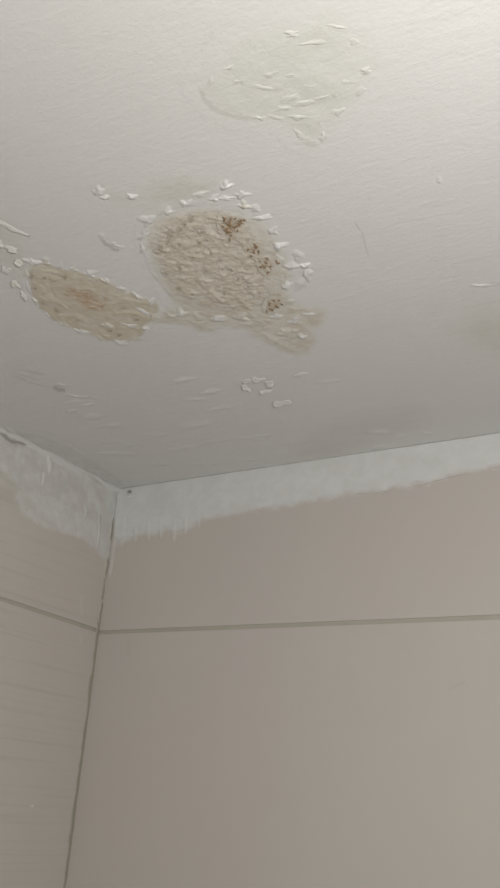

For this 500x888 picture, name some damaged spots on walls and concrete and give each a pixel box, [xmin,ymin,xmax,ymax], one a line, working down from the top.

water stain [0,161,338,361]